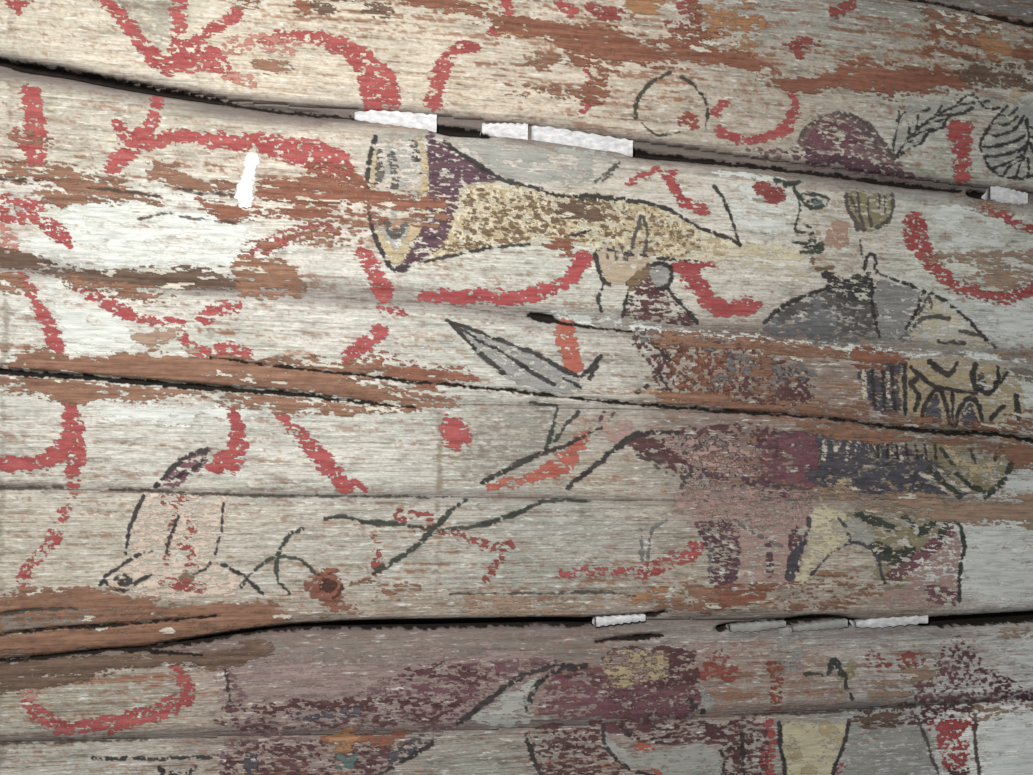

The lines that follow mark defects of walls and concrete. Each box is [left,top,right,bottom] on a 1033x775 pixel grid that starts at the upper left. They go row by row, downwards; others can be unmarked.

peeling [232,0,260,9]
crack [0,57,354,120]
peeling [250,59,294,75]
peeling [289,0,1033,106]
crack [436,124,490,139]
crack [633,149,985,199]
peeling [0,320,479,417]
crack [0,356,1033,443]
peeling [0,586,292,695]
crack [0,590,668,663]
crack [716,614,851,632]
crack [918,611,1033,628]